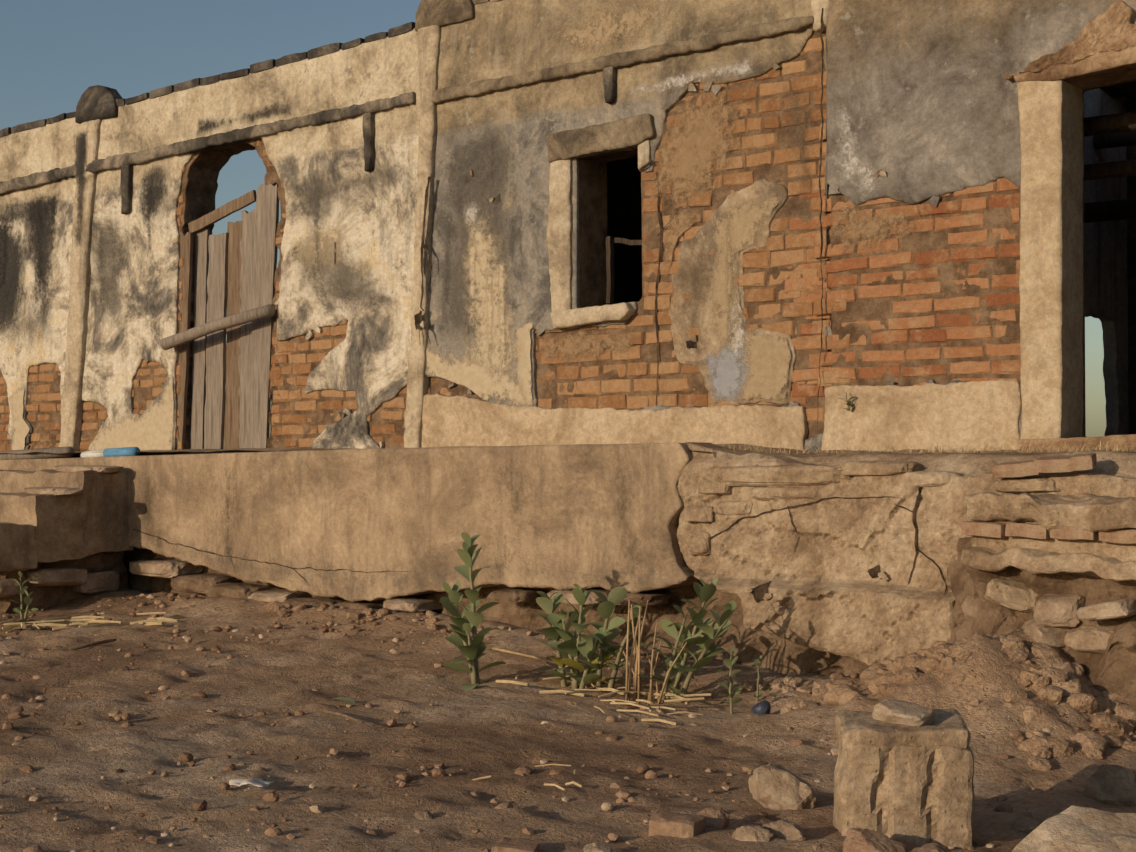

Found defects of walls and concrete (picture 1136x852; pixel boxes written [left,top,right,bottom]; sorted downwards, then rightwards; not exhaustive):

water stain [0,197,57,334]
peeling [176,152,200,244]
peeling [245,139,407,452]
water stain [296,167,397,308]
spalling [414,308,426,330]
water stain [442,131,514,333]
peeling [426,30,1021,439]
peeling [0,363,61,451]
crack [133,529,409,586]
crack [710,487,947,595]